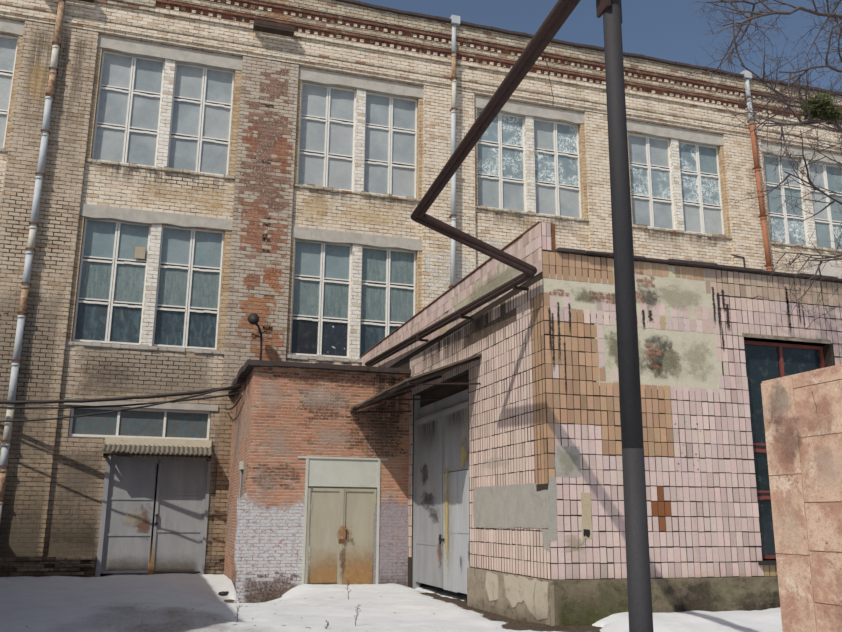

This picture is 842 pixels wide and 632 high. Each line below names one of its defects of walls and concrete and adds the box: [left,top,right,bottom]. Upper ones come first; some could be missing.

spalling [238,69,399,420]
damp [711,287,730,350]
damp [548,302,571,390]
spalling [253,464,299,489]
rust [129,510,149,533]
rust [107,555,195,575]
peeling [232,493,312,603]
rust [307,527,373,585]
flaking render [485,572,549,621]
damp [675,585,718,612]
damp [737,592,780,611]